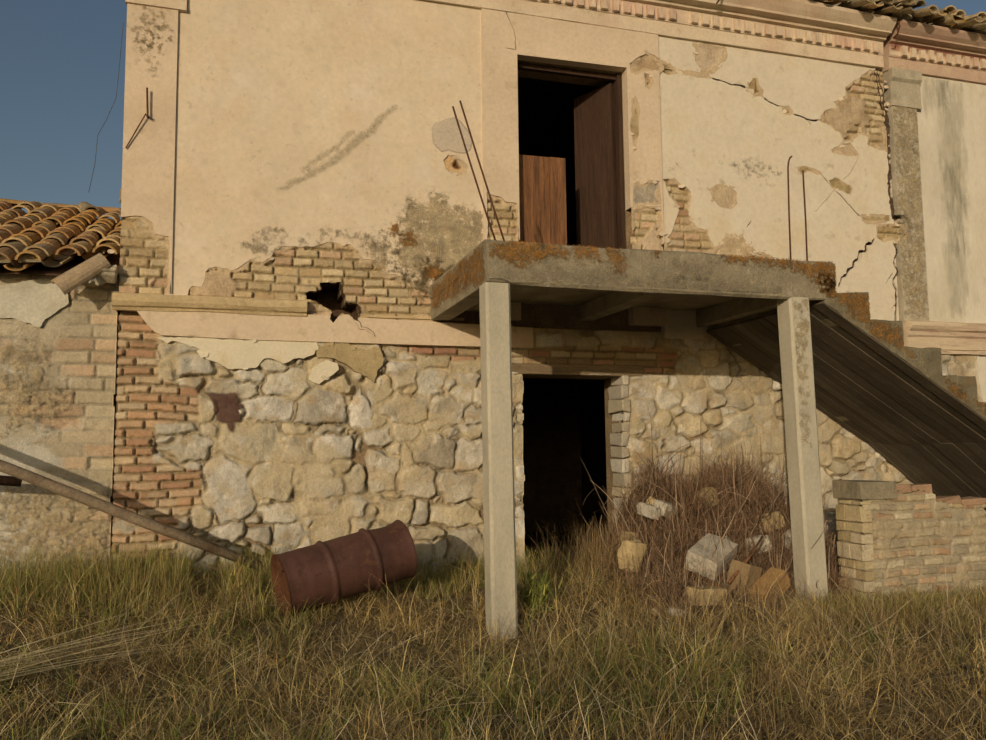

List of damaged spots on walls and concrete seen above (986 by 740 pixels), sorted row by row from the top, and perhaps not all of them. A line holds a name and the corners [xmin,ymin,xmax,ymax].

flaking render [630,42,728,90]
flaking render [630,96,641,153]
flaking render [817,70,890,159]
flaking render [443,100,518,241]
flaking render [630,178,773,259]
flaking render [787,156,854,261]
crack [838,69,904,320]
flaking render [188,242,440,323]